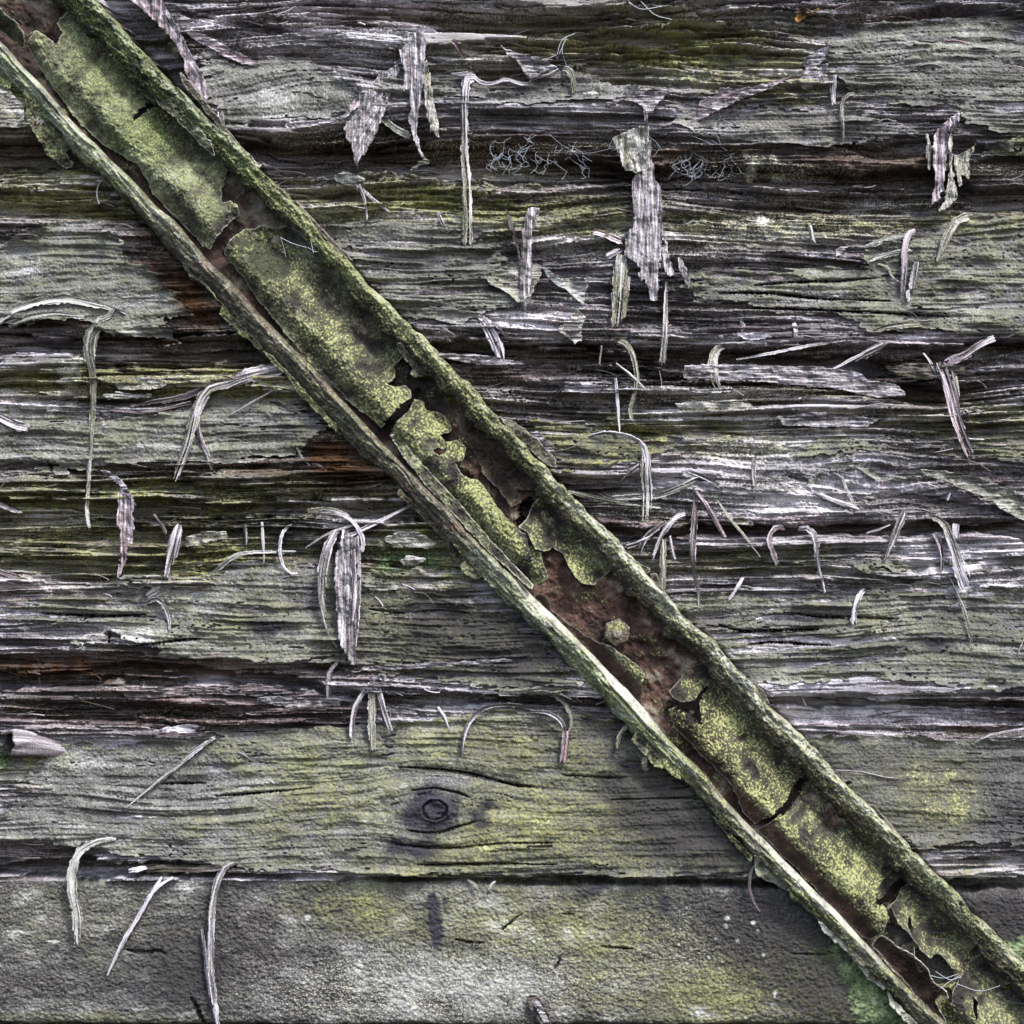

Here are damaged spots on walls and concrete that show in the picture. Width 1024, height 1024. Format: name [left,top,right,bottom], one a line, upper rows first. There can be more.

peeling [0,220,760,1024]
peeling [131,0,1024,693]